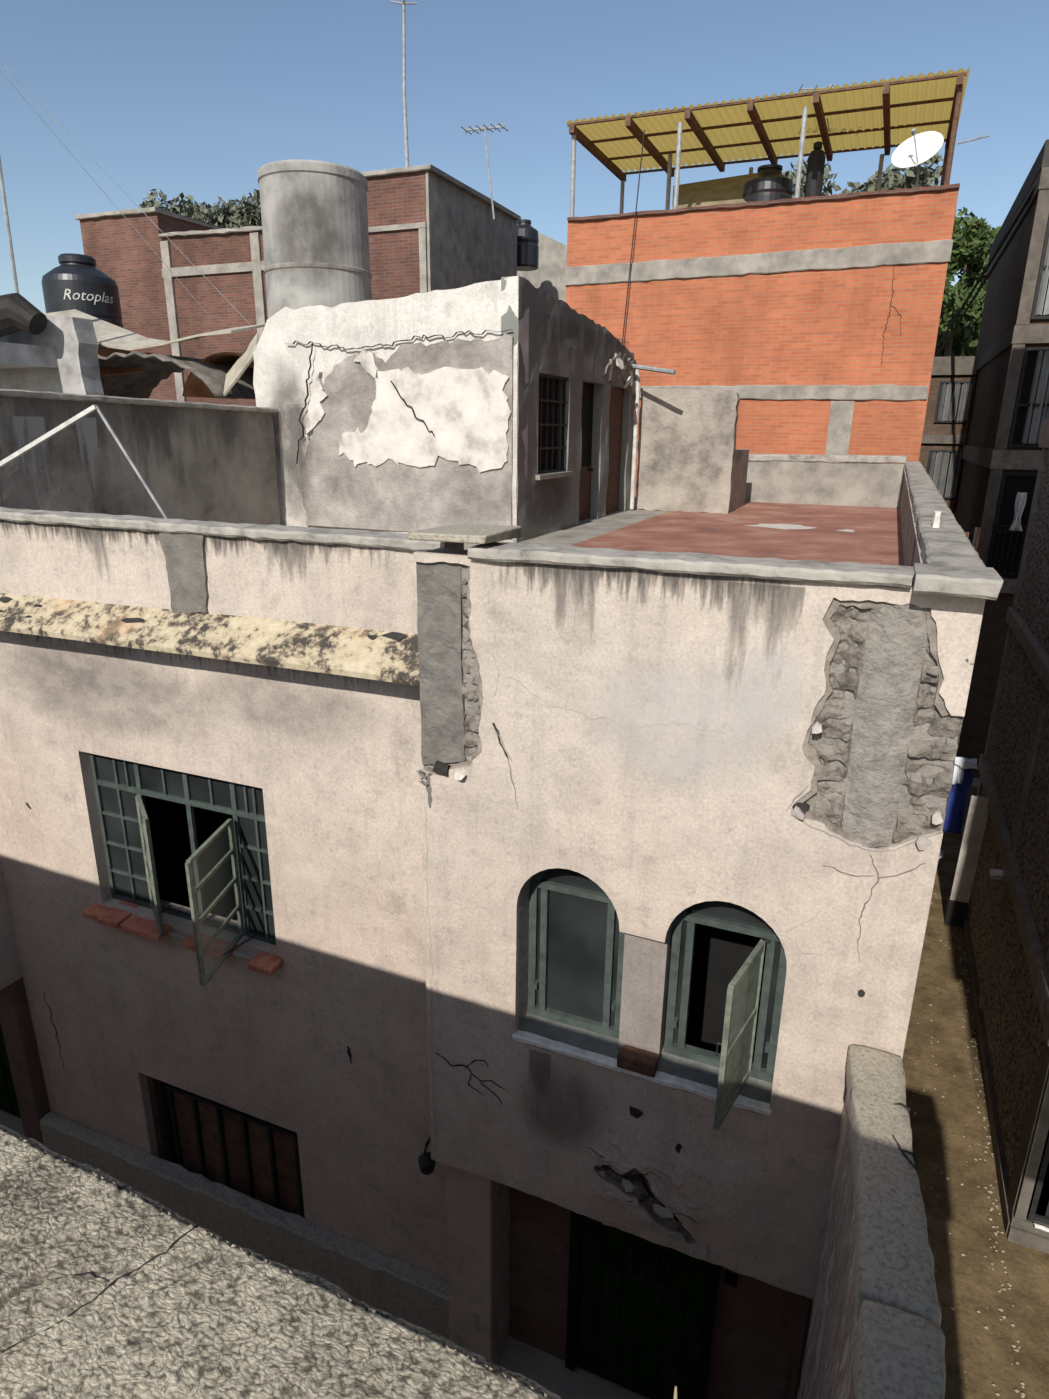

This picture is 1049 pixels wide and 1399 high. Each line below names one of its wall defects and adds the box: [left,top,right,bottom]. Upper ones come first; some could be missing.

peeling [297,334,514,532]
damp [523,563,780,595]
flaking render [367,562,483,808]
flaking render [783,598,963,852]
crack [425,808,507,1150]
crack [771,855,926,967]
crack [2,1223,198,1353]
flaking render [597,1156,708,1259]